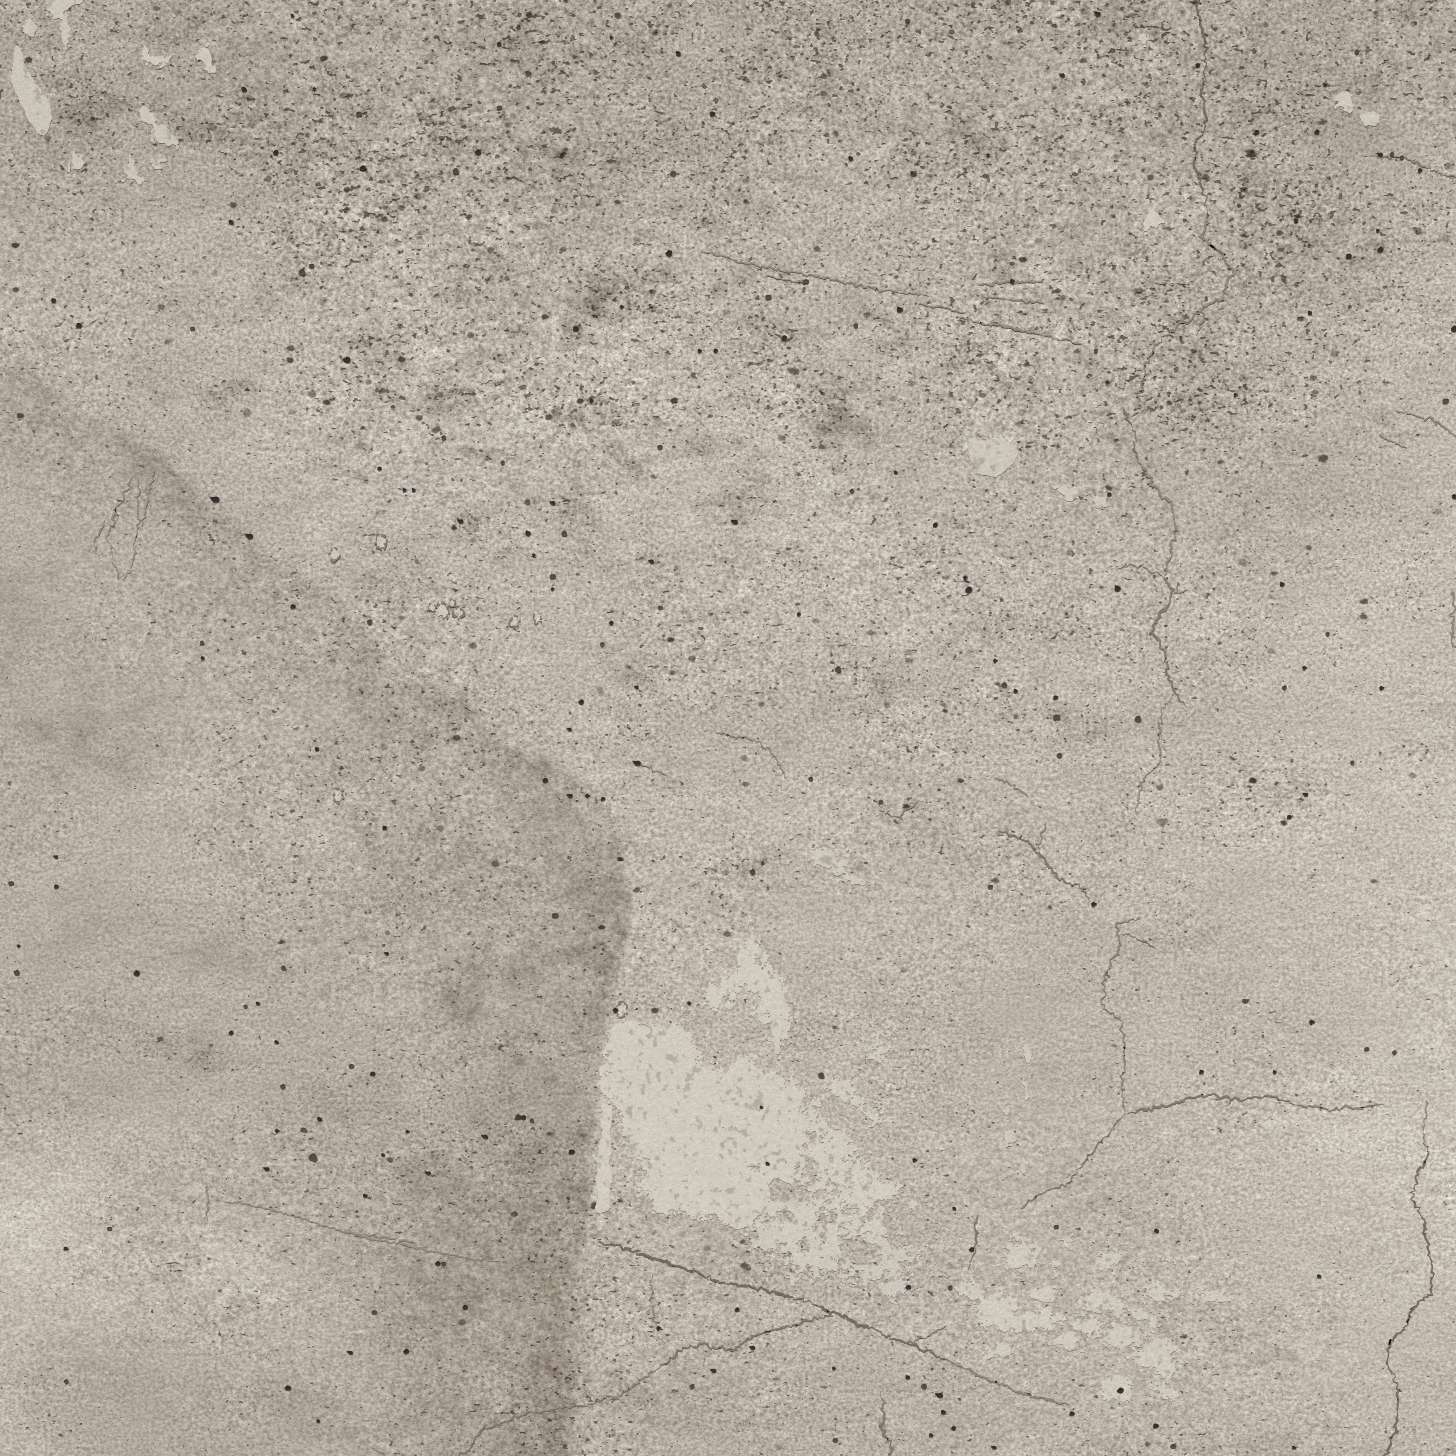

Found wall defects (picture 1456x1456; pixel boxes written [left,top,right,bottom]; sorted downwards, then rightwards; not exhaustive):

peeling [10,18,52,136]
peeling [46,0,83,50]
peeling [114,106,179,185]
peeling [142,44,172,68]
peeling [195,43,216,73]
crack [1118,0,1234,813]
crack [1379,410,1456,448]
water stain [0,348,639,1456]
crack [995,777,1380,1209]
peeling [595,936,920,1305]
crack [458,1241,1069,1456]
crack [1383,1100,1435,1456]